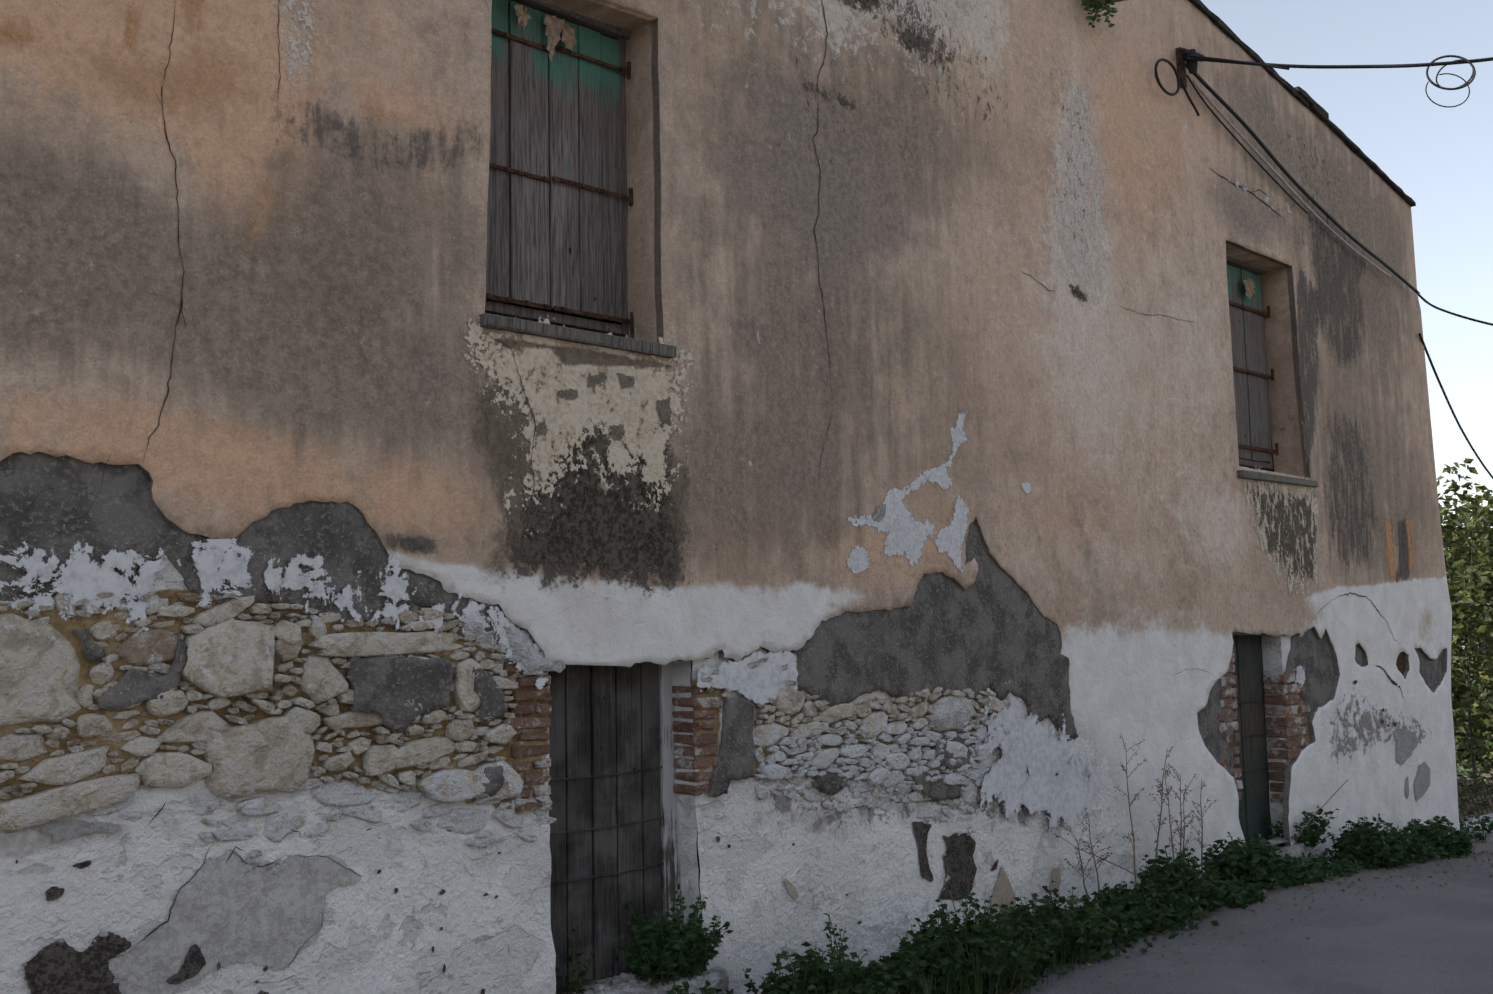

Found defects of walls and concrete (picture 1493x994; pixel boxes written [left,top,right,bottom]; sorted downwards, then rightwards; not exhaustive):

crack [21,11,186,524]
crack [275,0,283,109]
damp [291,102,359,158]
crack [813,0,832,478]
damp [808,0,978,59]
peeling [459,311,698,537]
damp [1296,201,1378,569]
spalling [0,452,566,691]
spalling [697,410,1109,916]
spalling [1197,632,1243,800]
flaking render [1263,629,1430,803]
peeling [22,849,381,994]